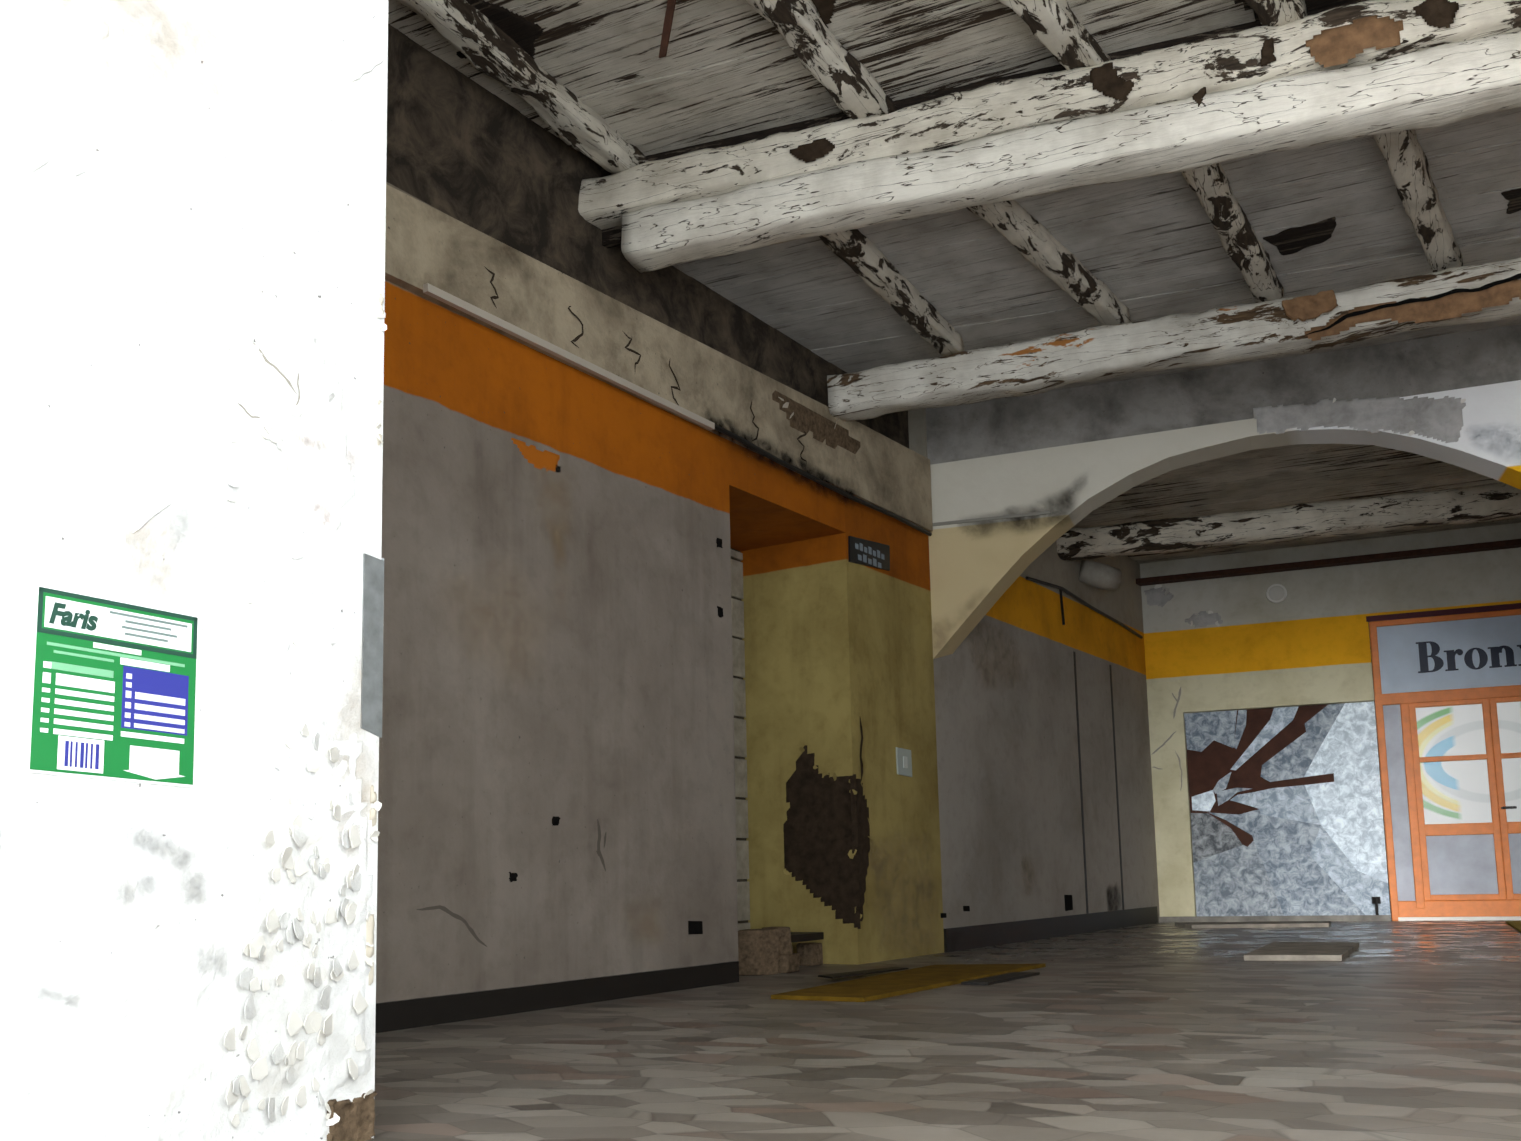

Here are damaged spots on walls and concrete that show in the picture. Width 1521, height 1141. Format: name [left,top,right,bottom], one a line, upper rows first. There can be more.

peeling [811,0,837,28]
peeling [1234,0,1260,22]
peeling [466,0,544,59]
peeling [1304,0,1459,68]
peeling [1260,38,1276,67]
peeling [1090,62,1134,101]
peeling [1192,87,1206,107]
peeling [790,138,835,163]
peeling [1501,188,1521,214]
peeling [1263,217,1336,255]
peeling [783,745,873,929]